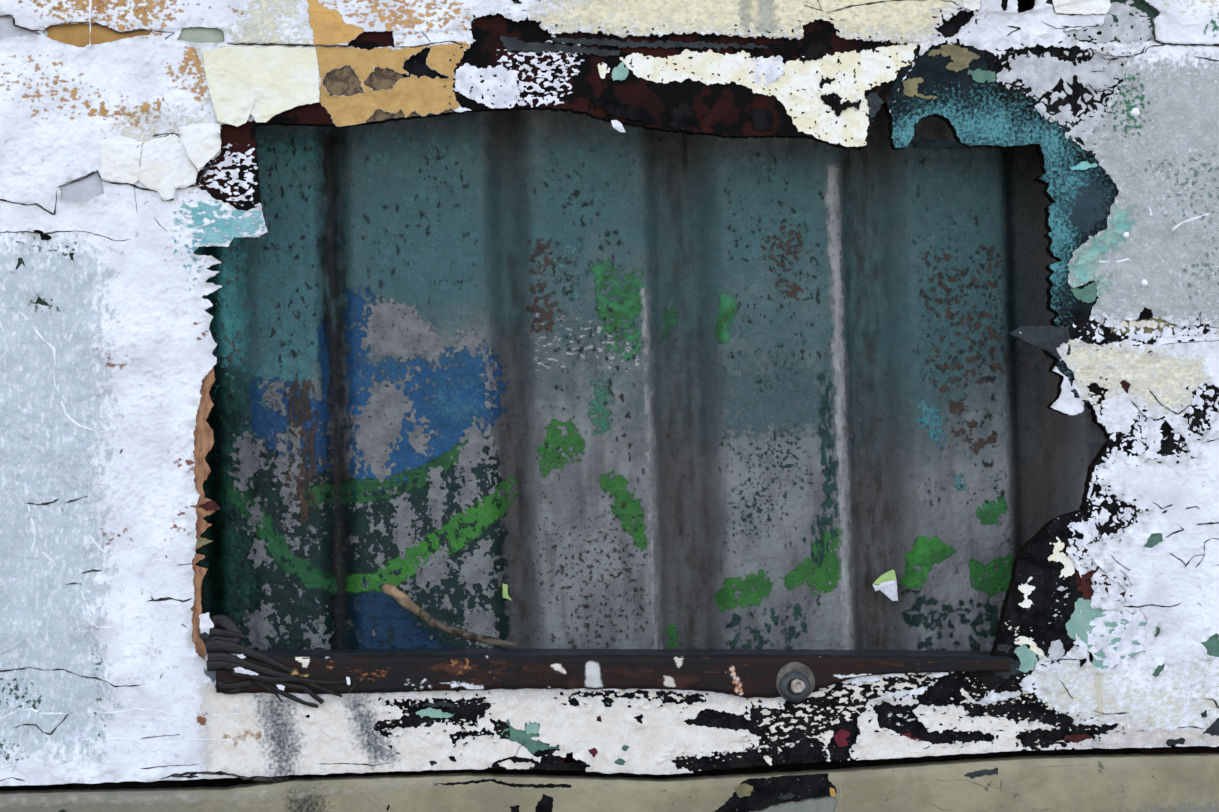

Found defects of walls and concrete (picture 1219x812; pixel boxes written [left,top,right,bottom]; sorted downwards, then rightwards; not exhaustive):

crack [1,14,174,39]
corrosion [19,0,210,38]
crack [226,41,356,49]
crack [1088,0,1219,92]
crack [0,152,222,241]
peeling [60,0,1216,365]
peeling [228,282,318,573]
peeling [347,144,512,649]
peeling [186,365,219,660]
peeling [553,352,1219,812]
corrosion [429,659,582,687]
corrosion [600,666,701,689]